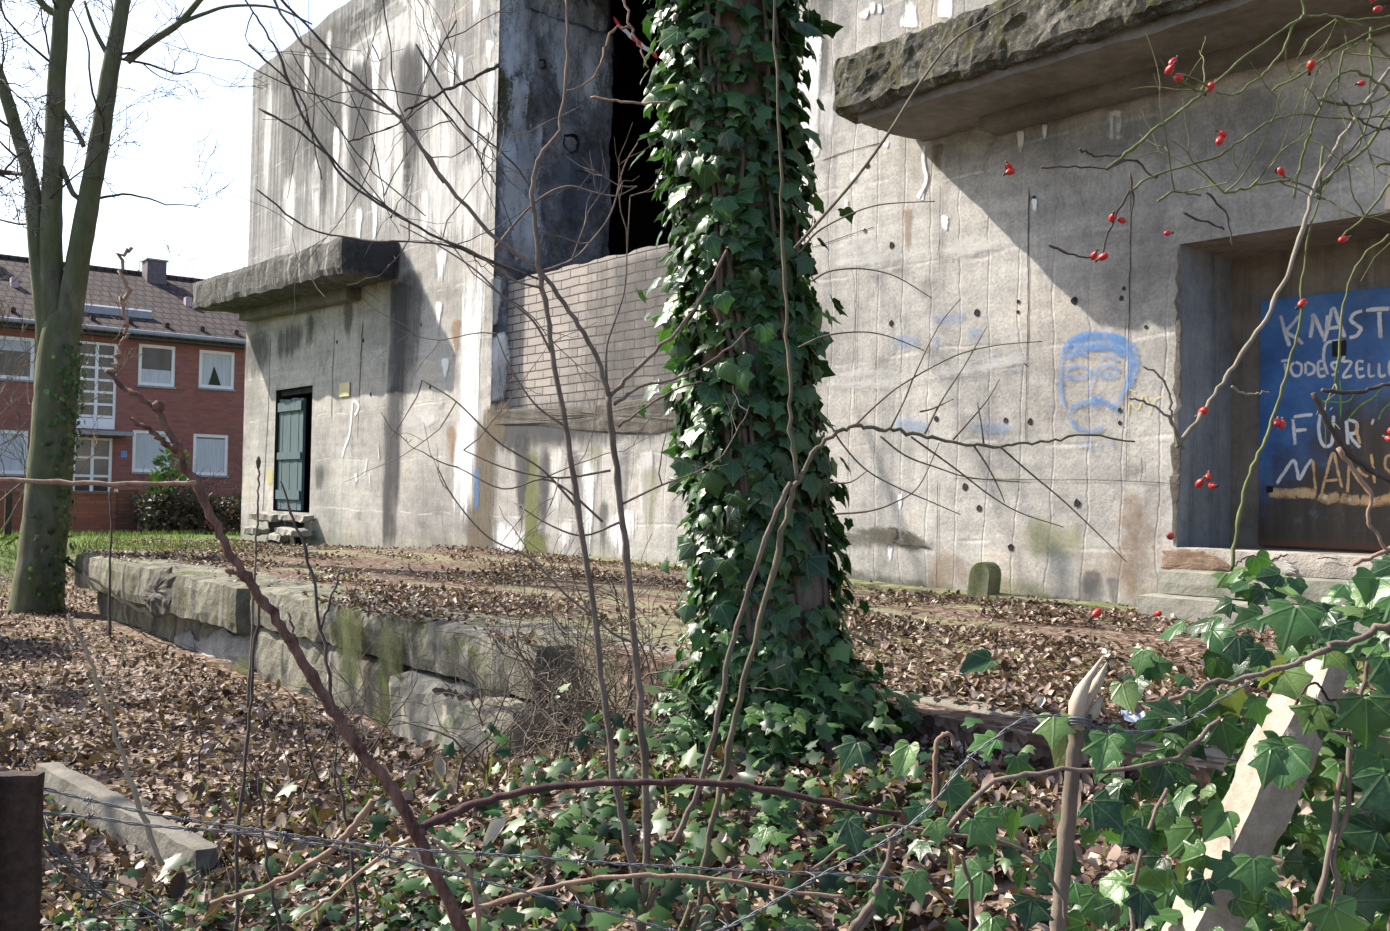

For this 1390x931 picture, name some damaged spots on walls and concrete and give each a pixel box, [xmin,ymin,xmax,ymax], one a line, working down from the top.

damp [264,0,680,554]
damp [248,316,313,372]
crack [432,671,512,701]